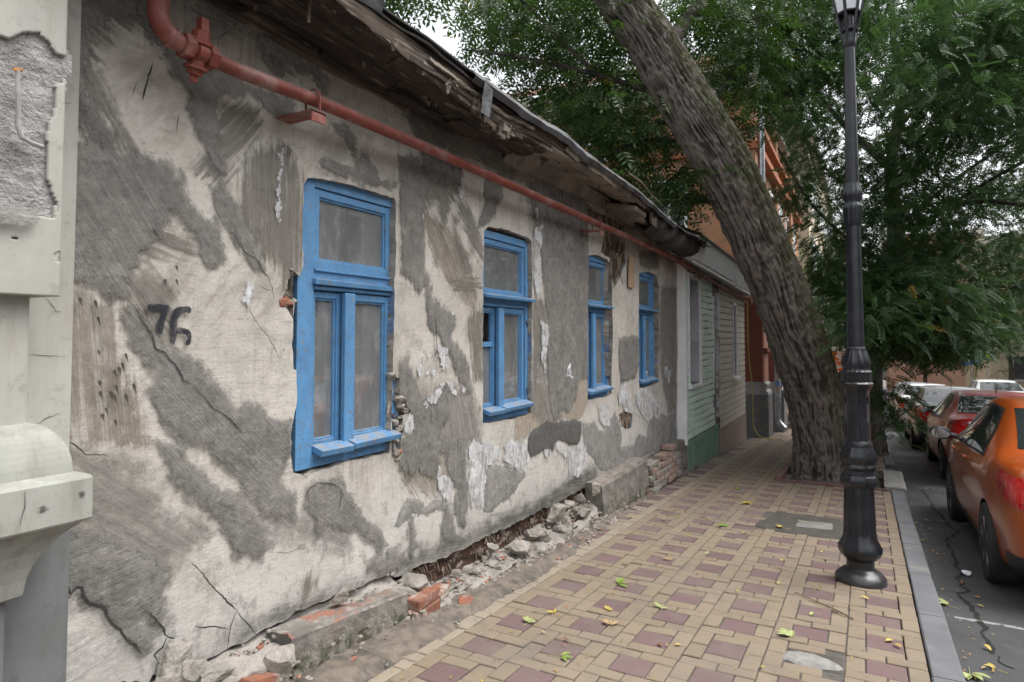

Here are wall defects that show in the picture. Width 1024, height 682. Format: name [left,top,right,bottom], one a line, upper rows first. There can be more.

flaking render [0,33,72,227]
crack [131,303,244,434]
peeling [468,320,661,507]
peeling [437,465,453,500]
crack [68,563,256,663]